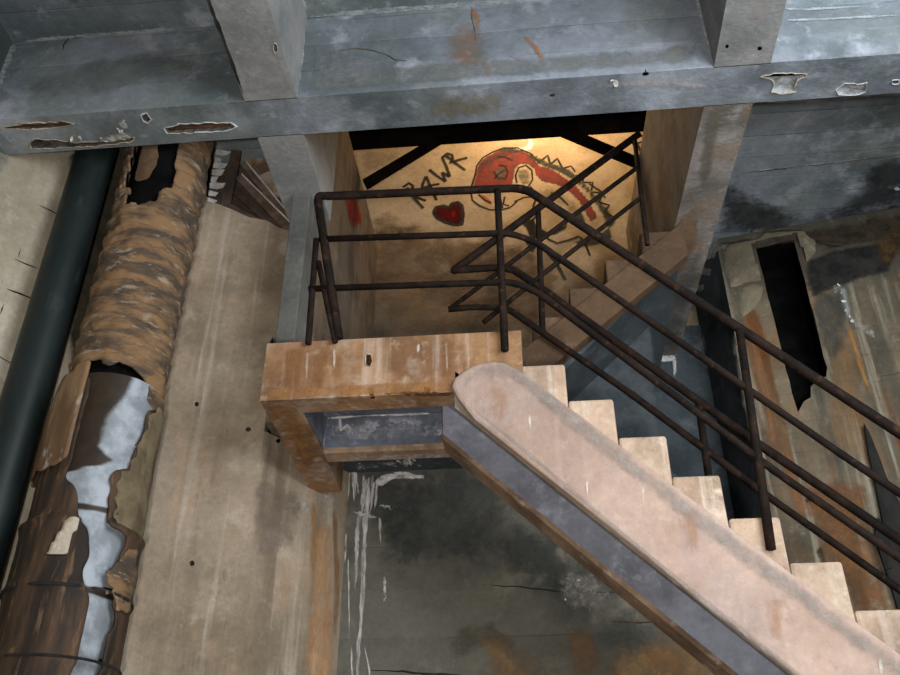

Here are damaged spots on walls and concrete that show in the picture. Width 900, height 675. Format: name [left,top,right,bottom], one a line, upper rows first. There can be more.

spalling [761,72,807,94]
spalling [835,82,868,96]
spalling [0,120,135,149]
spalling [163,122,238,134]
leakage [816,161,900,220]
leakage [344,454,517,675]
crack [493,585,615,593]
crack [370,667,458,675]